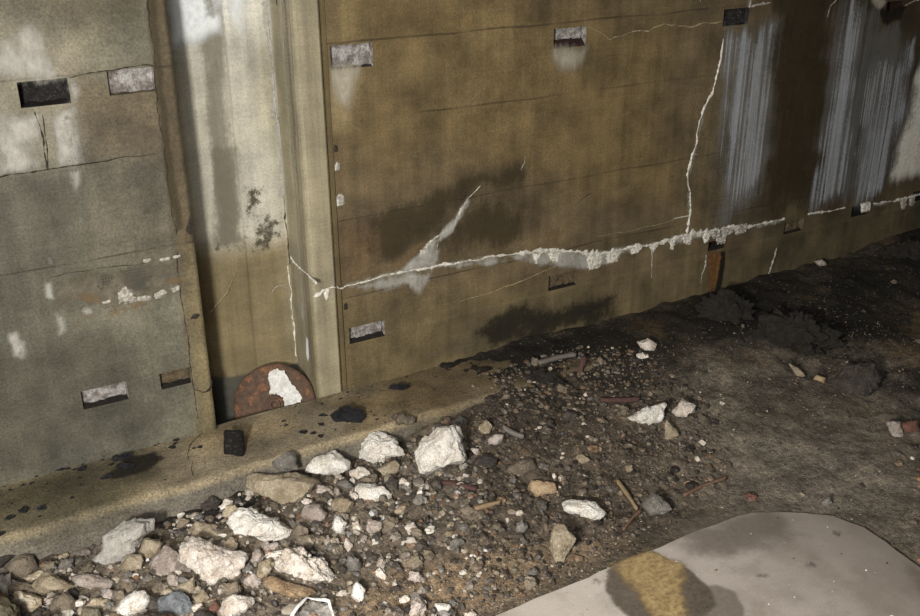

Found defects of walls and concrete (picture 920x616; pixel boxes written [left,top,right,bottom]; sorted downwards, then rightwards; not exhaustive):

crack [873,0,919,10]
crack [272,0,785,357]
damp [721,24,773,203]
crack [808,193,920,215]
damp [811,0,920,210]
damp [481,298,611,344]